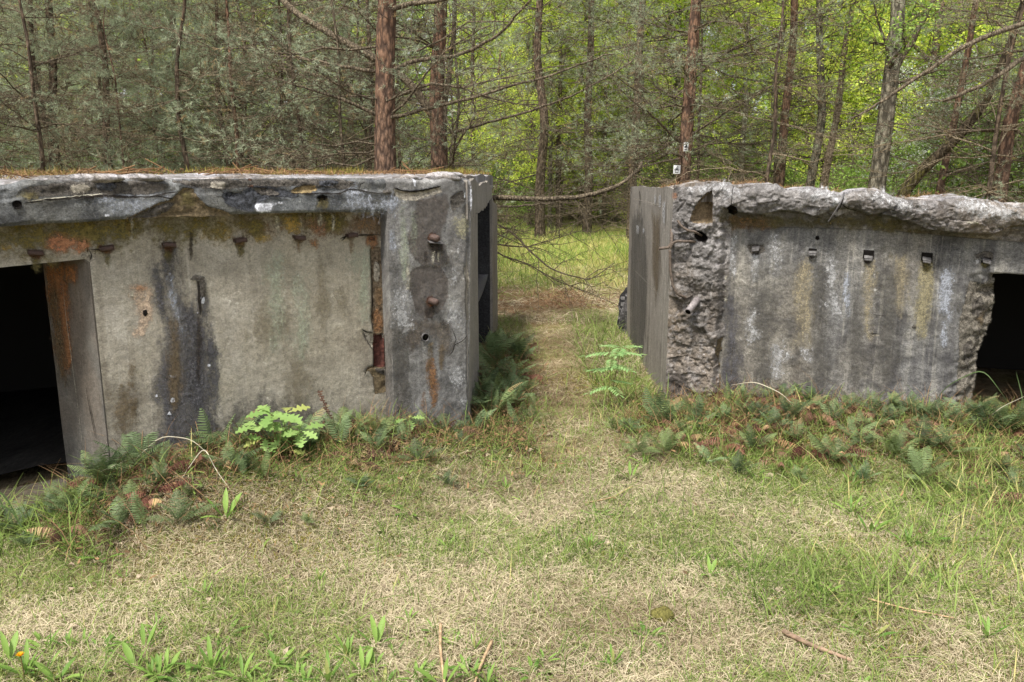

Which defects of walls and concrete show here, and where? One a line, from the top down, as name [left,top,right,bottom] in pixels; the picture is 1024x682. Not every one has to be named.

spalling [677,191,713,236]
water stain [151,233,324,452]
rust [422,343,444,408]
spalling [715,337,733,397]
water stain [719,214,960,392]
spalling [956,277,995,411]